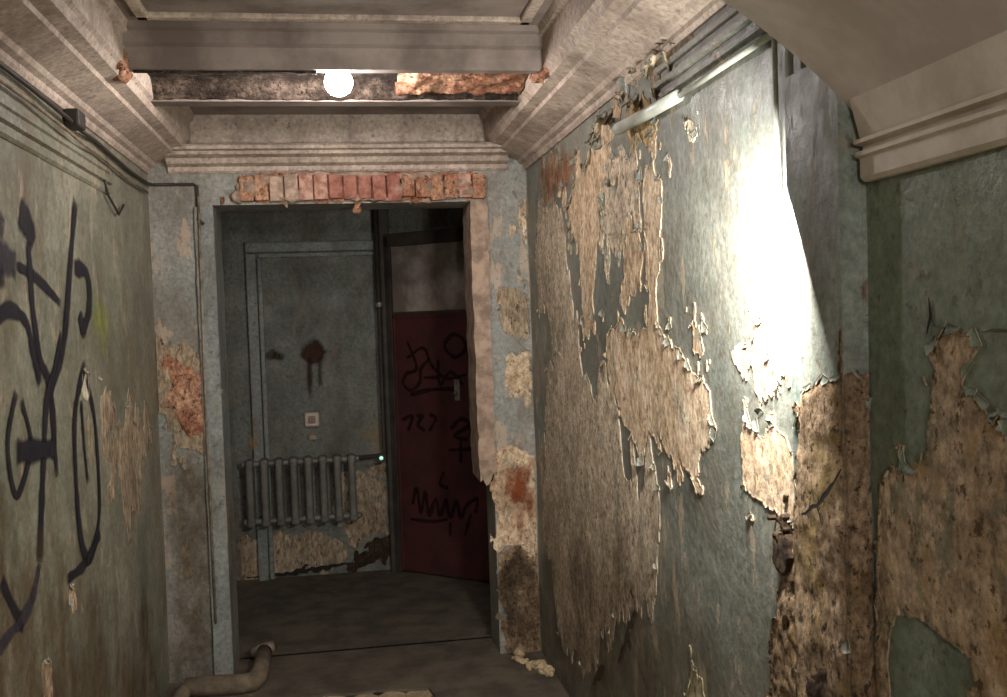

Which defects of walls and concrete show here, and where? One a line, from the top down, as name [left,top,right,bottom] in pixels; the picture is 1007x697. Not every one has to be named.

flaking render [112,48,550,101]
flaking render [82,334,205,544]
peeling [236,462,390,581]
peeling [490,33,717,679]
peeling [731,303,1007,697]
peeling [683,645,705,697]